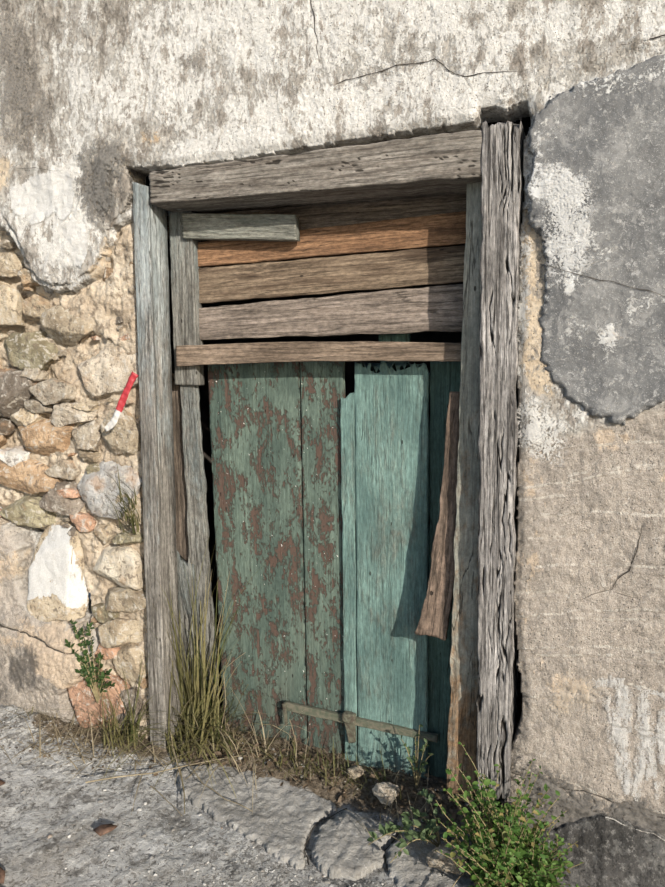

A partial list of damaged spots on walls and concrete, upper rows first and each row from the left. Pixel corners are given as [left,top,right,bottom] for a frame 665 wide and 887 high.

crack [337,58,523,86]
peeling [541,166,594,283]
spalling [0,152,150,739]
crack [580,528,642,601]
crack [0,624,71,654]
crack [553,783,665,841]